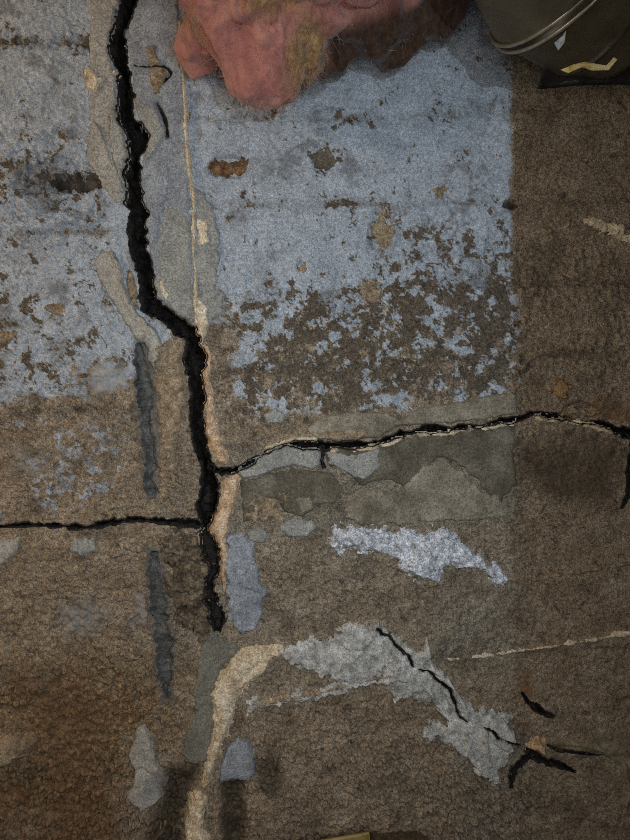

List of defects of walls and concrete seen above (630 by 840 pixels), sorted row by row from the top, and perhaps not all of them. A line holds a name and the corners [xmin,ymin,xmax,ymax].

peeling [49,0,131,205]
peeling [124,0,226,343]
crack [0,0,630,633]
crack [145,552,175,702]
peeling [157,392,518,786]
crack [377,628,602,789]